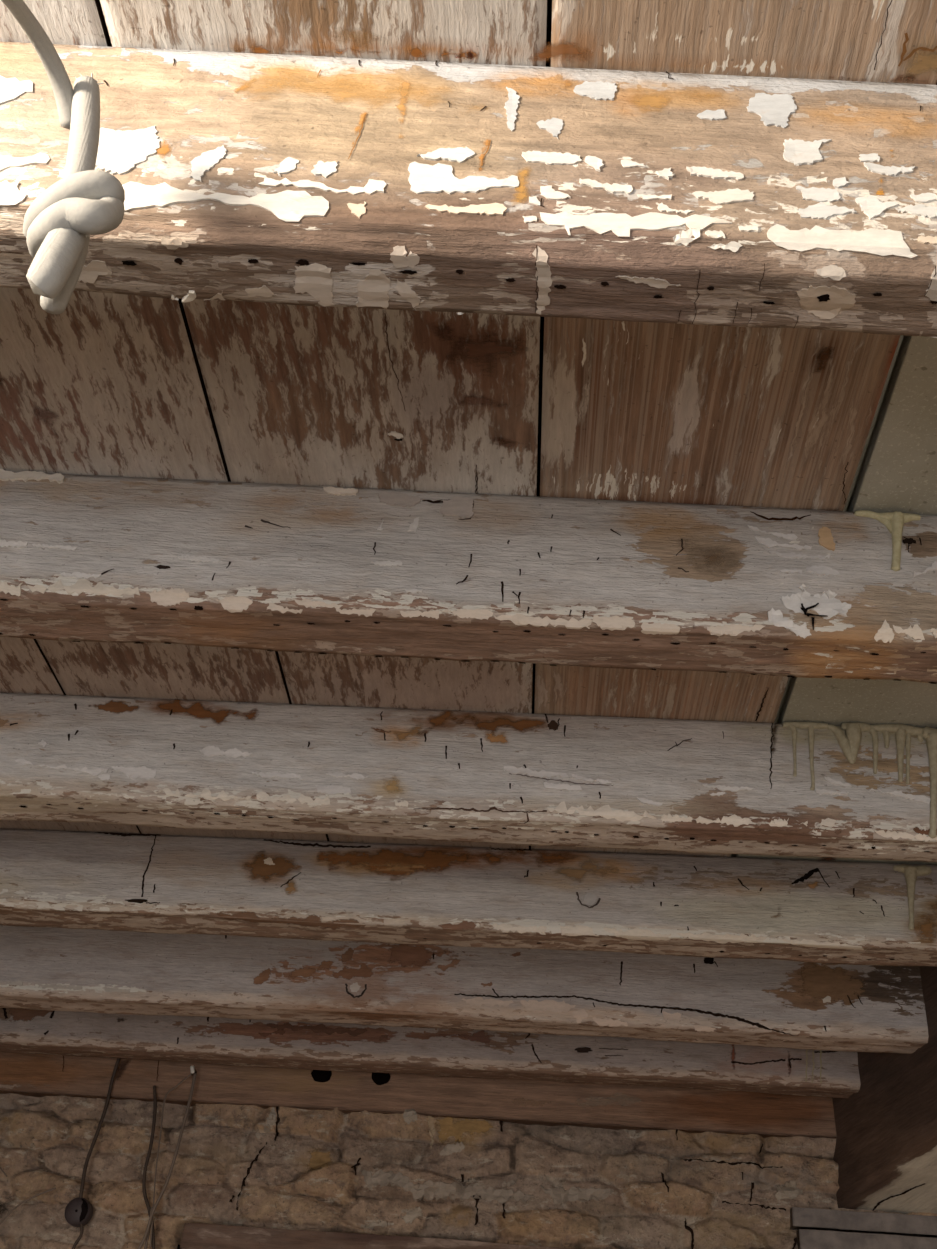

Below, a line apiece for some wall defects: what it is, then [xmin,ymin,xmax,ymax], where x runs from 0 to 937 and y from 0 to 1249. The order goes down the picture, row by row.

crack [874,0,892,70]
peeling [747,93,832,166]
peeling [95,126,387,222]
peeling [408,118,937,319]
spalling [707,525,851,639]
peeling [400,609,680,635]
peeling [504,765,842,836]
crack [97,832,161,897]
crack [264,839,371,848]
peeling [439,921,864,950]
crack [454,961,838,1068]
crack [229,1107,280,1210]